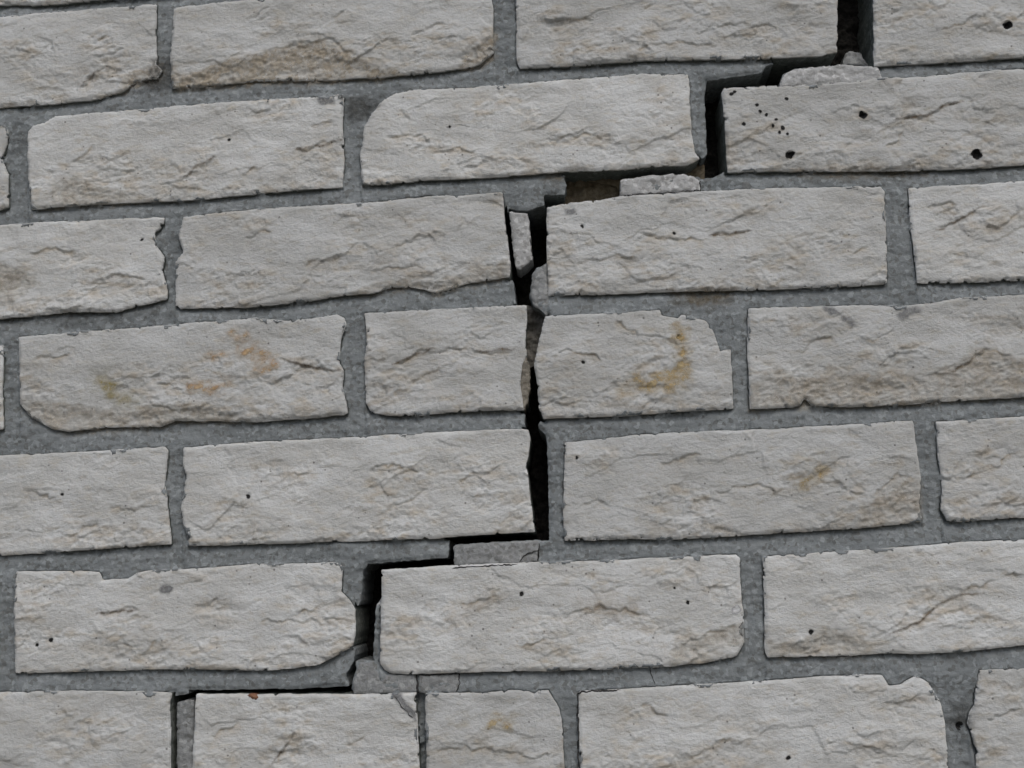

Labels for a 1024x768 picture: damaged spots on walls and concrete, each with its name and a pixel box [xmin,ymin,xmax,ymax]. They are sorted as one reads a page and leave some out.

crack [830,0,860,66]
crack [563,101,719,204]
crack [366,224,549,656]
crack [394,673,460,718]
crack [576,689,619,766]